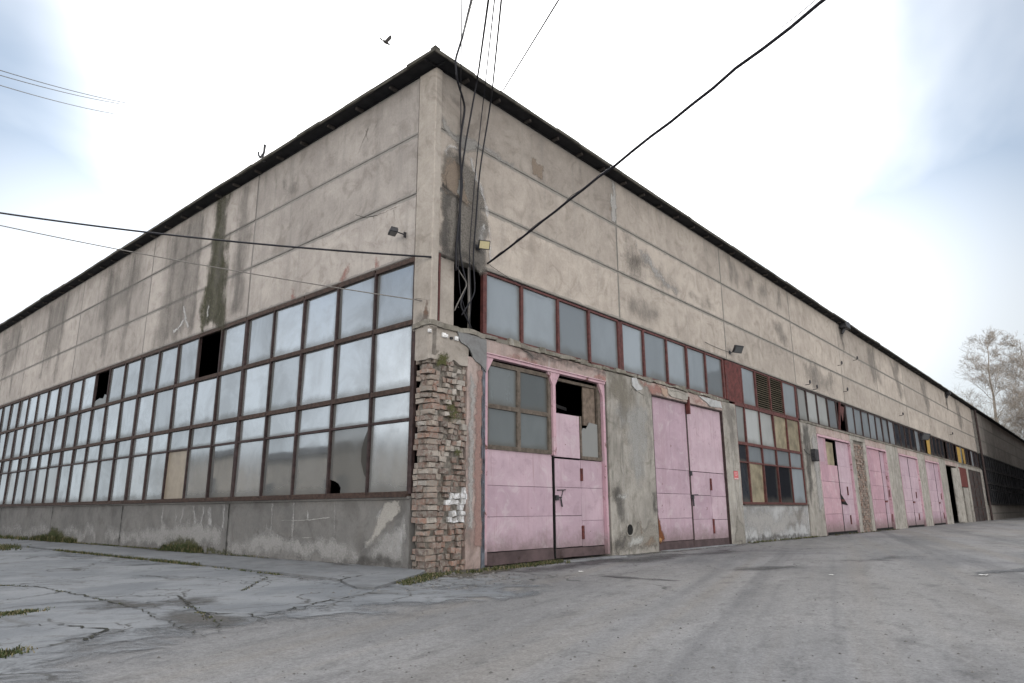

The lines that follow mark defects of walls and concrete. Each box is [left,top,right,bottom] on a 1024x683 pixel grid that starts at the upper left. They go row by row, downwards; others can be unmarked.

damp [200,202,225,331]
damp [439,145,491,273]
peeling [457,332,487,546]
flaking render [631,378,722,408]
peeling [366,500,400,546]